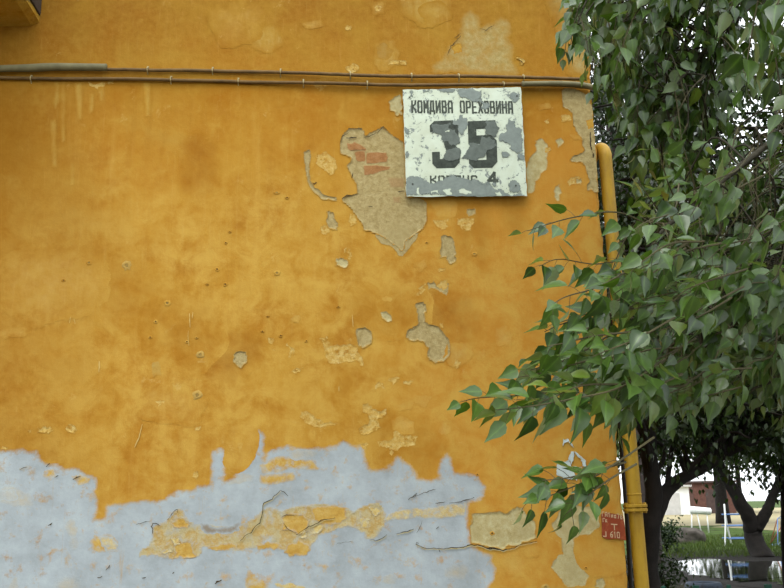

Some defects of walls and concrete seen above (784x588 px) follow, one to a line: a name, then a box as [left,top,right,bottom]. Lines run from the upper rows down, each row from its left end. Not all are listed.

flaking render [398,0,525,76]
peeling [561,36,590,78]
flaking render [526,88,599,202]
flaking render [303,126,476,369]
peeling [222,420,320,485]
peeling [358,395,432,456]
crack [240,491,288,541]
peeling [243,570,305,588]
crack [284,515,334,536]
flaking render [139,502,540,579]
crack [372,523,537,552]
flaking render [541,505,626,588]